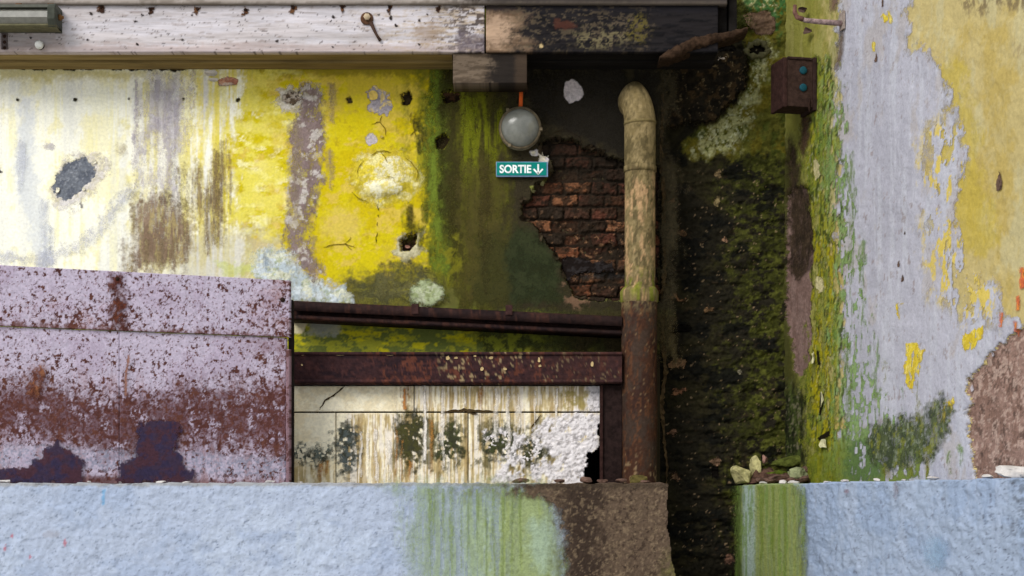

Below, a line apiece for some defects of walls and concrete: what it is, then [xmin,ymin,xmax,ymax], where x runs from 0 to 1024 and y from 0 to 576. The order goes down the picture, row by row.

spalling [51,153,110,209]
damp [80,75,231,272]
damp [253,83,449,307]
spalling [519,136,625,302]
peeling [819,0,1024,481]
corrosion [107,272,127,328]
corrosion [25,365,46,396]
corrosion [0,440,86,483]
corrosion [114,420,197,483]
damp [294,386,465,481]
damp [481,388,549,466]
spalling [504,342,687,576]